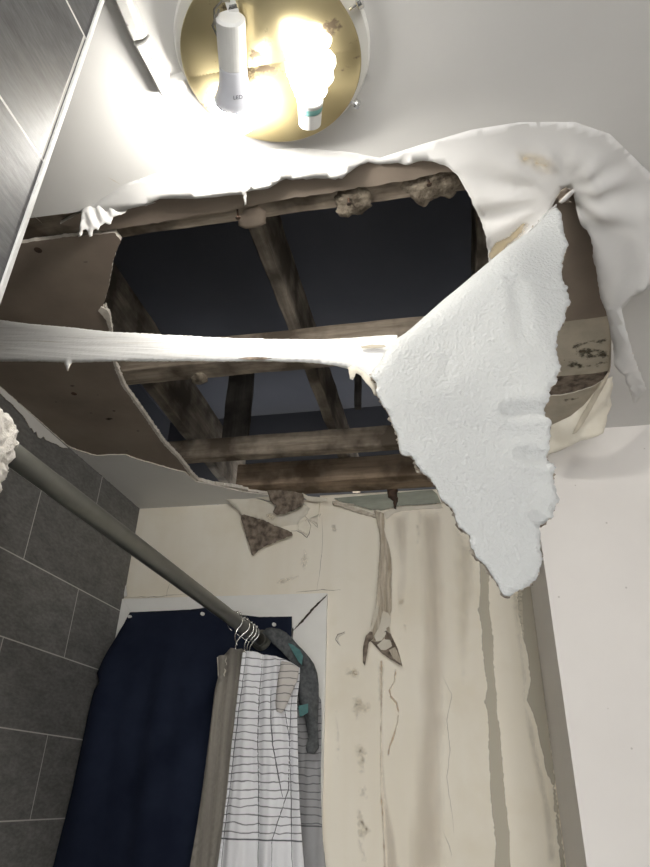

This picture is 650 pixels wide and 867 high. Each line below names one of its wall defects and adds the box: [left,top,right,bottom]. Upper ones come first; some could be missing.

peeling [0,204,571,666]
leakage [568,339,606,368]
leakage [478,563,510,867]
leakage [518,587,565,867]